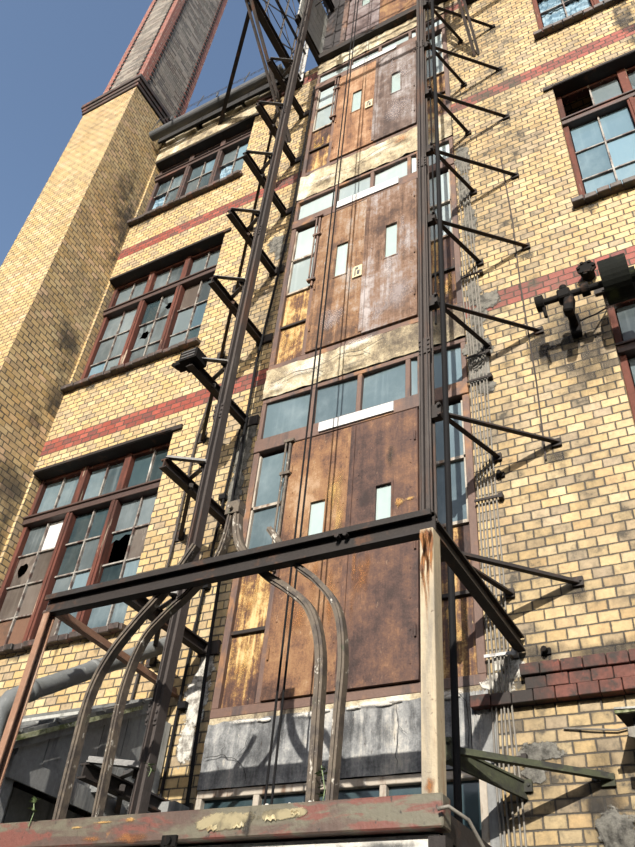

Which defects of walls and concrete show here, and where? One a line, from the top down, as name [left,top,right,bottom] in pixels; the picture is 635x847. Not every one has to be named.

water stain [60,323,77,349]
rust [420,530,433,599]
peeling [198,655,215,683]
peeling [176,720,196,769]
peeling [520,767,546,784]